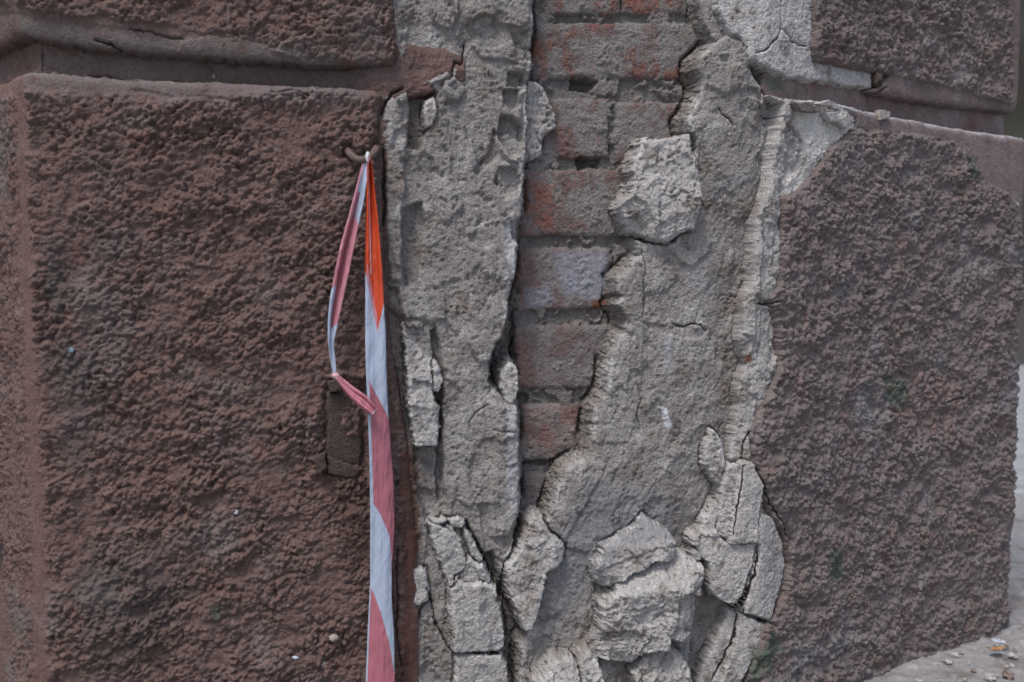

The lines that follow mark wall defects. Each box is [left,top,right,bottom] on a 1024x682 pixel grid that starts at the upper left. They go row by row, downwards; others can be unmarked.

spalling [381,0,872,682]
crack [733,431,787,536]
crack [395,520,499,663]